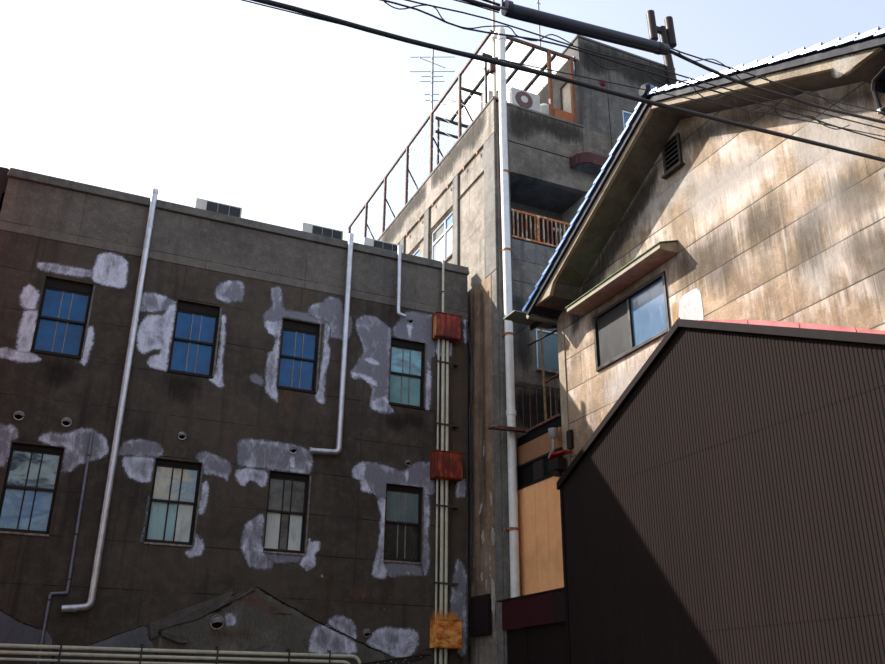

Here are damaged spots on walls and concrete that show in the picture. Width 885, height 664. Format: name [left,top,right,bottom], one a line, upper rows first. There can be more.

water stain [511,109,580,141]
water stain [681,90,878,149]
peeling [37,253,128,288]
water stain [577,167,658,299]
peeling [0,284,41,363]
peeling [137,293,176,370]
peeling [249,287,452,414]
water stain [570,314,581,331]
peeling [196,439,313,515]
peeling [241,514,320,571]
peeling [352,462,435,579]
flaking render [0,588,419,664]